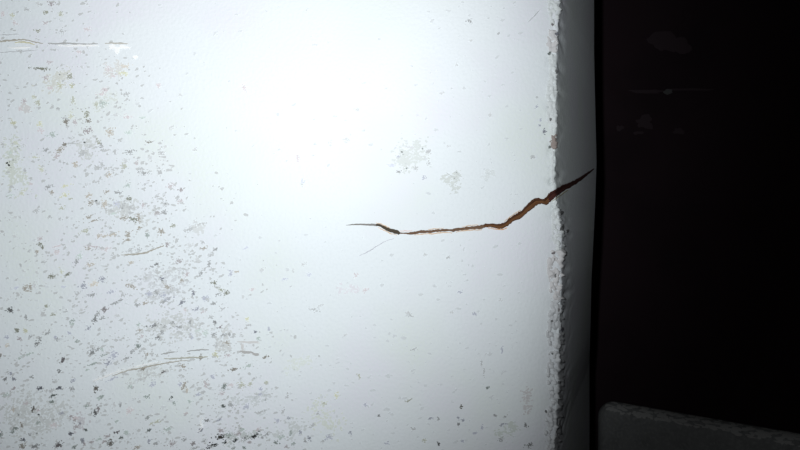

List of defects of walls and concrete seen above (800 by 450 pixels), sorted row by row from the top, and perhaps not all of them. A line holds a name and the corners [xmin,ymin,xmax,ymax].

crack [350,169,594,256]